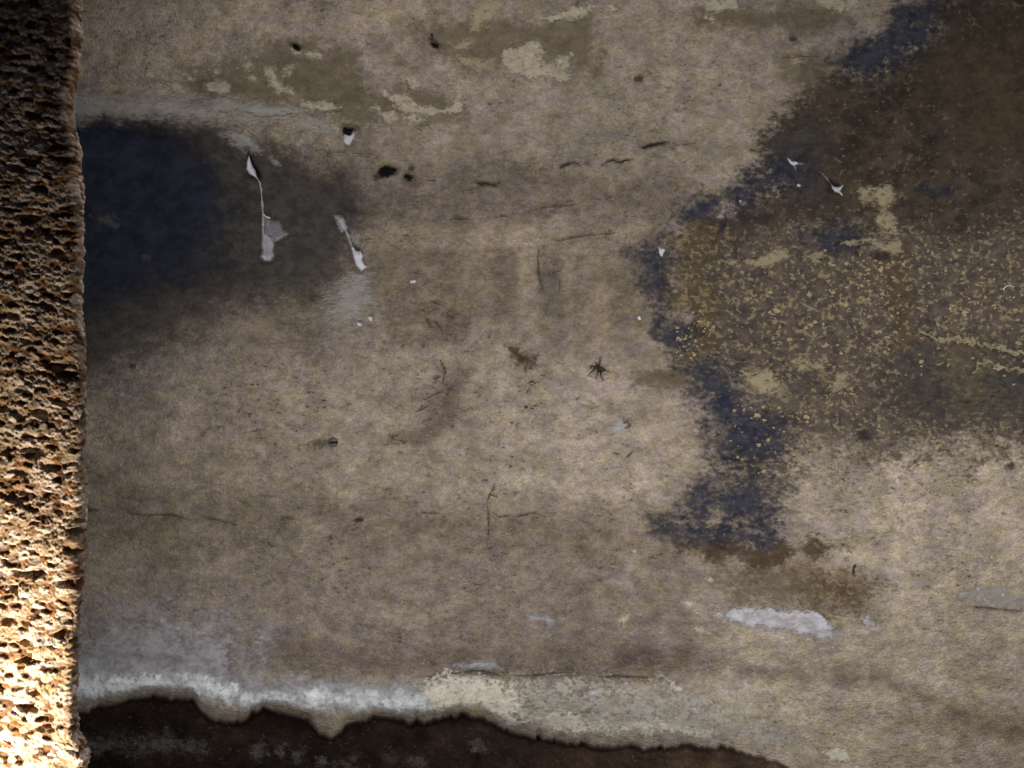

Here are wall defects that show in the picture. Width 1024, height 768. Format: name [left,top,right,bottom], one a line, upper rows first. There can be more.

water stain [73,36,468,373]
water stain [622,0,1024,552]
water stain [249,742,356,768]
water stain [76,598,808,764]
water stain [822,746,851,762]